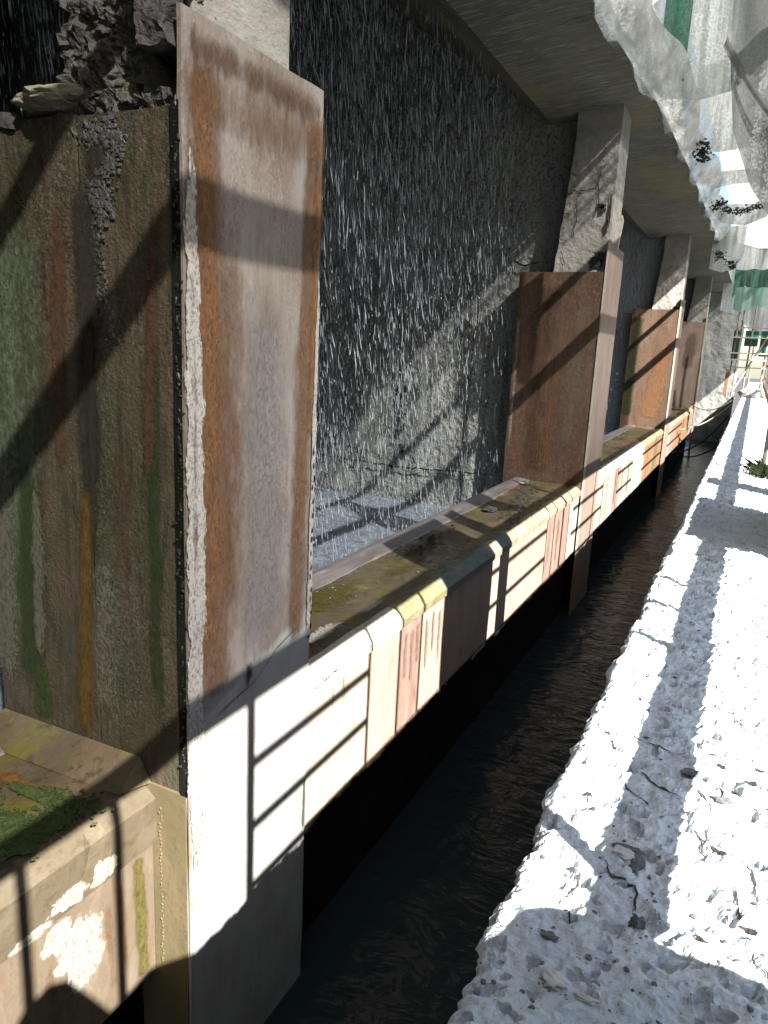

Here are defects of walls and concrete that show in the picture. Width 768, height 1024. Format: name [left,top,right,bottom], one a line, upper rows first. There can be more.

spalling [10,83,128,348]
crack [513,162,602,267]
leakage [0,234,53,717]
leakage [72,192,164,730]
rust [187,25,323,695]
rust [642,347,669,417]
peeling [8,855,118,996]
crack [559,858,638,924]